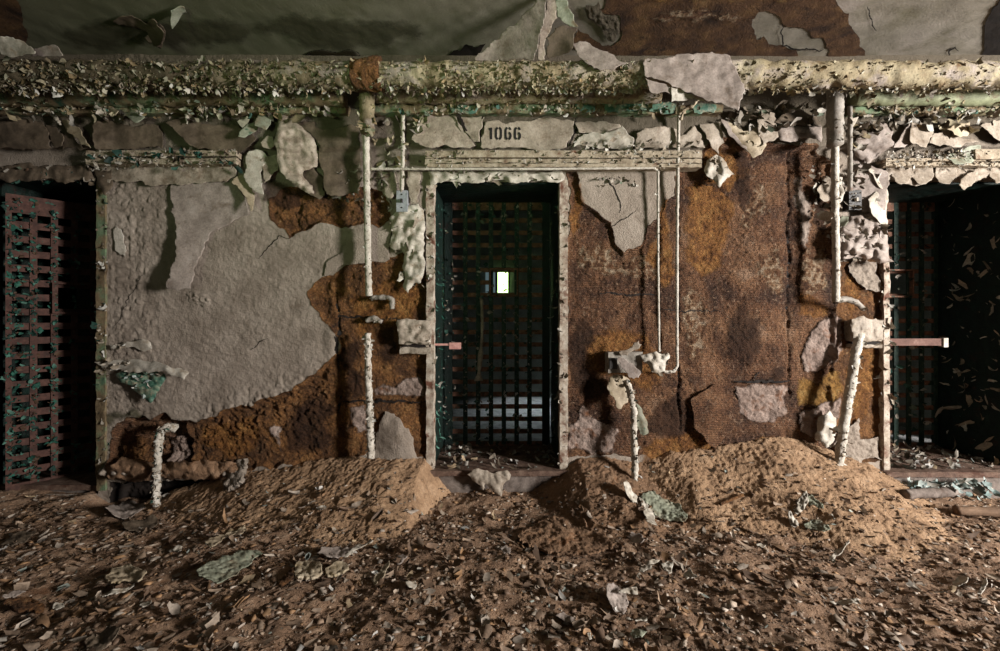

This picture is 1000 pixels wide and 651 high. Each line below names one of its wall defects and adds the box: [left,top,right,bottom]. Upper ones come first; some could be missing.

flaking render [0,0,1000,506]